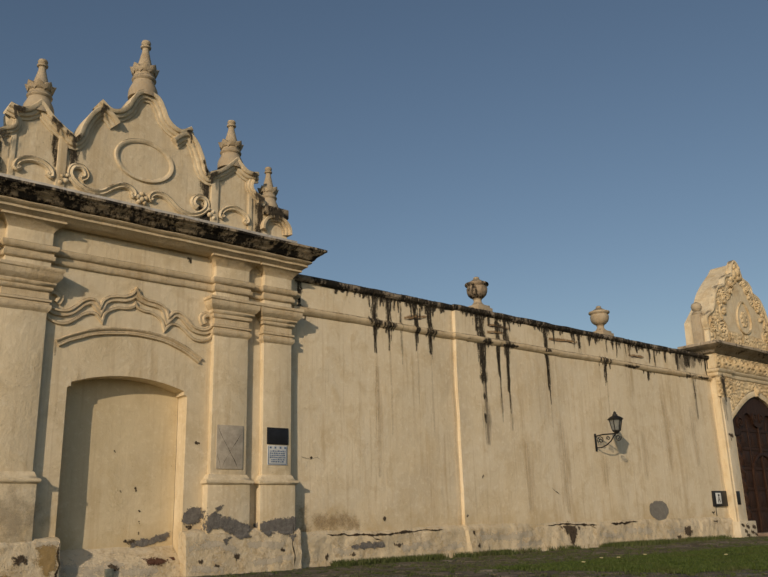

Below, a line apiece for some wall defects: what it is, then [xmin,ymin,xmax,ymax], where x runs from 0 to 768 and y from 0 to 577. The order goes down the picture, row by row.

leakage [198,158,218,221]
leakage [253,172,283,233]
leakage [334,282,446,354]
leakage [460,306,523,406]
leakage [533,323,711,404]
flaking render [11,545,58,577]
crack [53,543,61,577]
flaking render [123,510,170,548]
flaking render [143,557,175,566]
flaking render [350,541,403,556]
crack [328,529,443,540]
flaking render [560,521,580,547]